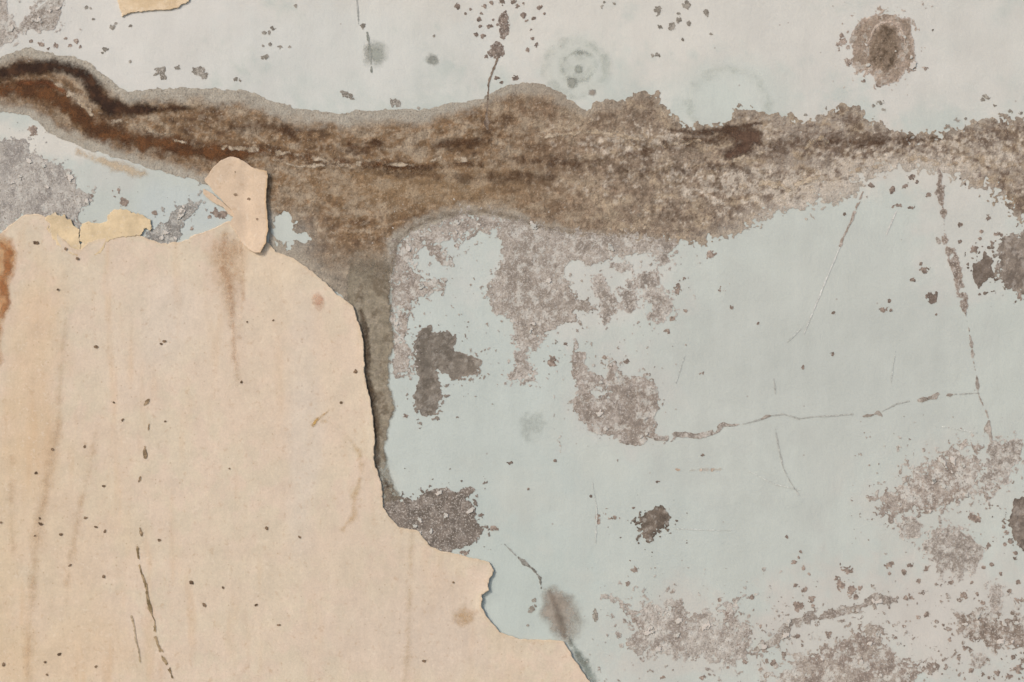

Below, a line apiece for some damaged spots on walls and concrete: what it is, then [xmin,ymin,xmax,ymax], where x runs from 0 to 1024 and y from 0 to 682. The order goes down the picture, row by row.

peeling [109,0,189,30]
spalling [153,65,208,89]
damp [454,0,546,59]
damp [654,0,691,41]
peeling [0,122,621,682]
damp [0,47,1024,501]
spalling [378,198,696,446]
crack [653,168,993,495]
spalling [592,427,1024,682]